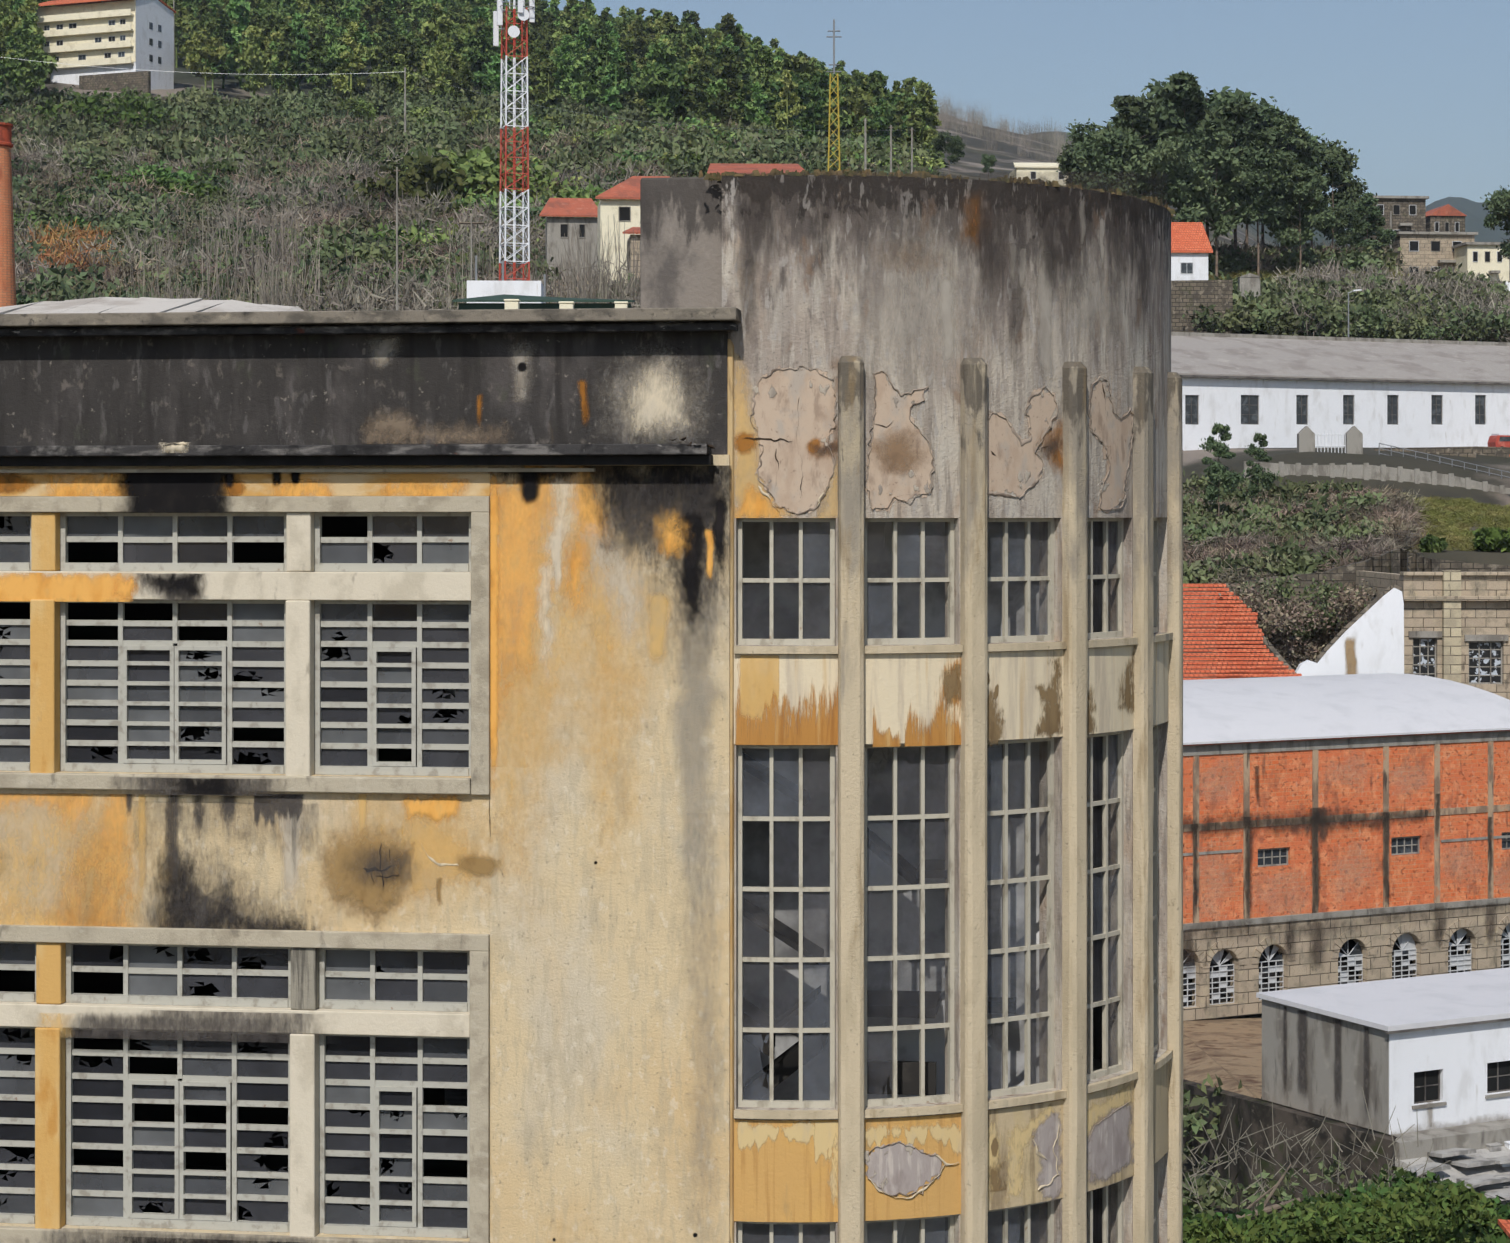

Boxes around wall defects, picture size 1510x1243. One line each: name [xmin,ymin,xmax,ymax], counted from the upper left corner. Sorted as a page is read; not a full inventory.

leakage [1079,200,1105,259]
corrosion [579,381,589,420]
spalling [734,366,838,518]
spalling [864,371,935,513]
leakage [491,472,574,653]
leakage [615,499,726,614]
peeling [735,655,838,745]
peeling [872,657,961,747]
peeling [1034,660,1063,739]
leakage [127,777,303,920]
spalling [864,1123,961,1199]
leakage [59,1233,243,1243]